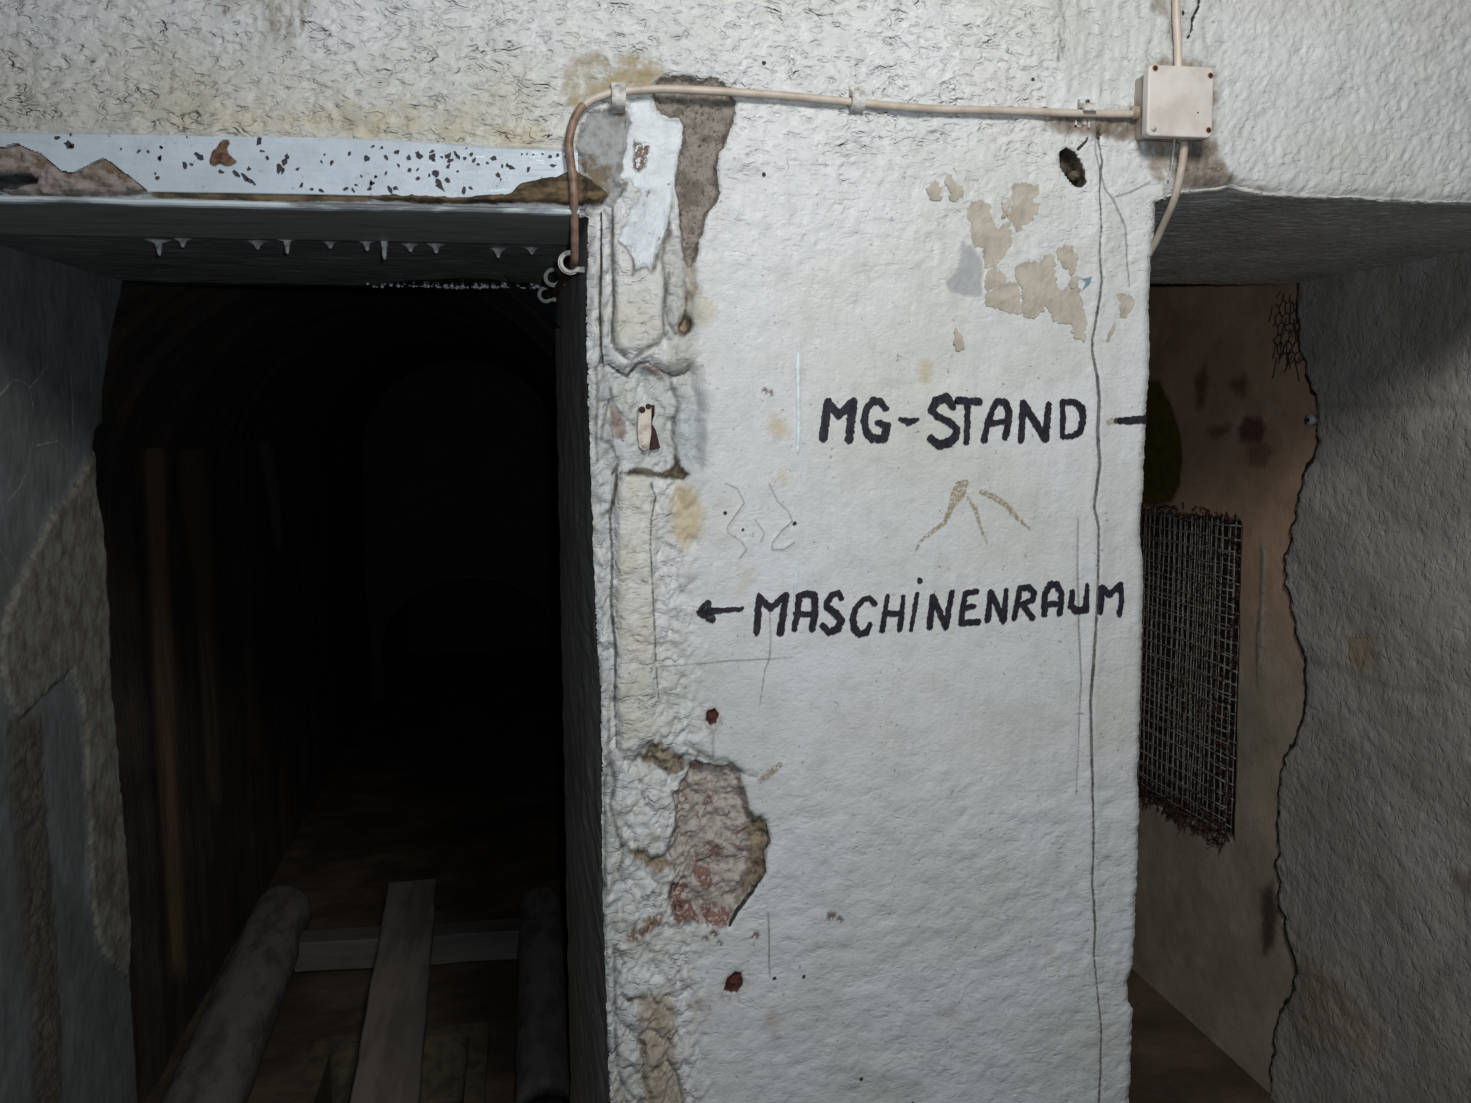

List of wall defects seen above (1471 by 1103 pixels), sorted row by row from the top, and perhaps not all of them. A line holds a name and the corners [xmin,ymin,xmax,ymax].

crack [1186,0,1200,39]
spalling [0,144,163,197]
peeling [218,166,256,185]
peeling [257,137,324,193]
flaking render [320,109,632,208]
spalling [653,74,736,329]
peeling [926,174,1088,342]
peeling [953,328,965,351]
peeling [1106,293,1135,342]
spalling [630,742,771,927]